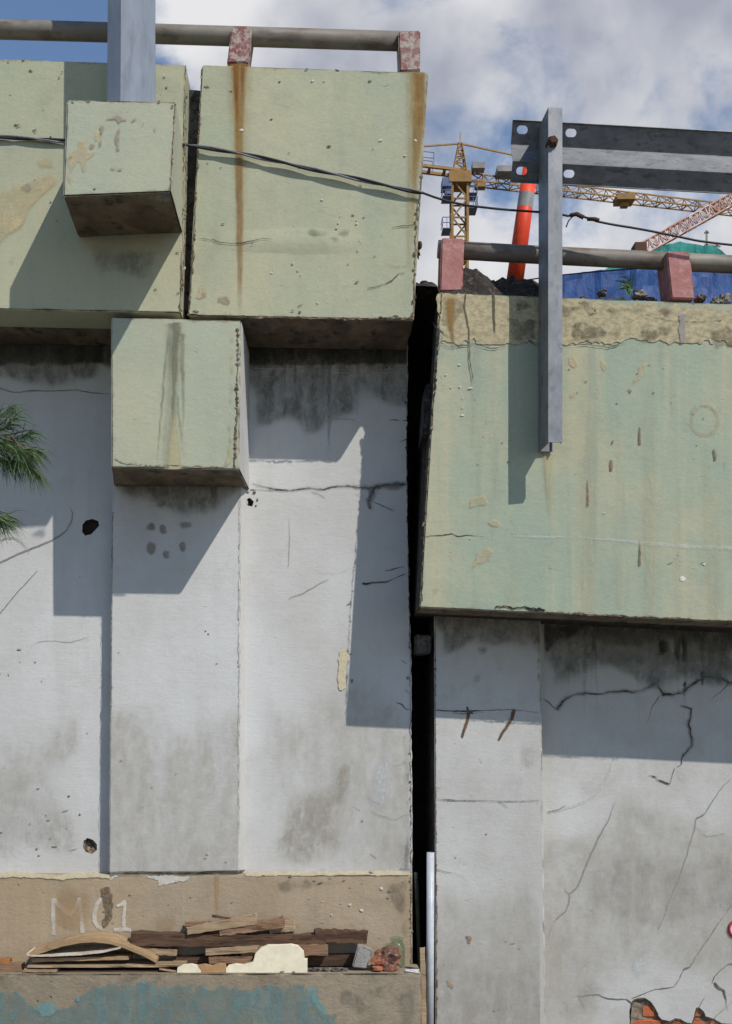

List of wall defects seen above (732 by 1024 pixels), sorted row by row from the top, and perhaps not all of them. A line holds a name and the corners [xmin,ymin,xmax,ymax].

rust [233,64,245,242]
rust [411,72,424,166]
damp [0,343,103,383]
damp [168,322,184,469]
damp [248,347,407,428]
spalling [562,298,732,370]
crack [0,510,73,614]
spalling [82,519,99,536]
crack [253,482,407,511]
spalling [245,293,539,965]
crack [437,676,732,785]
flaking render [629,998,725,1024]